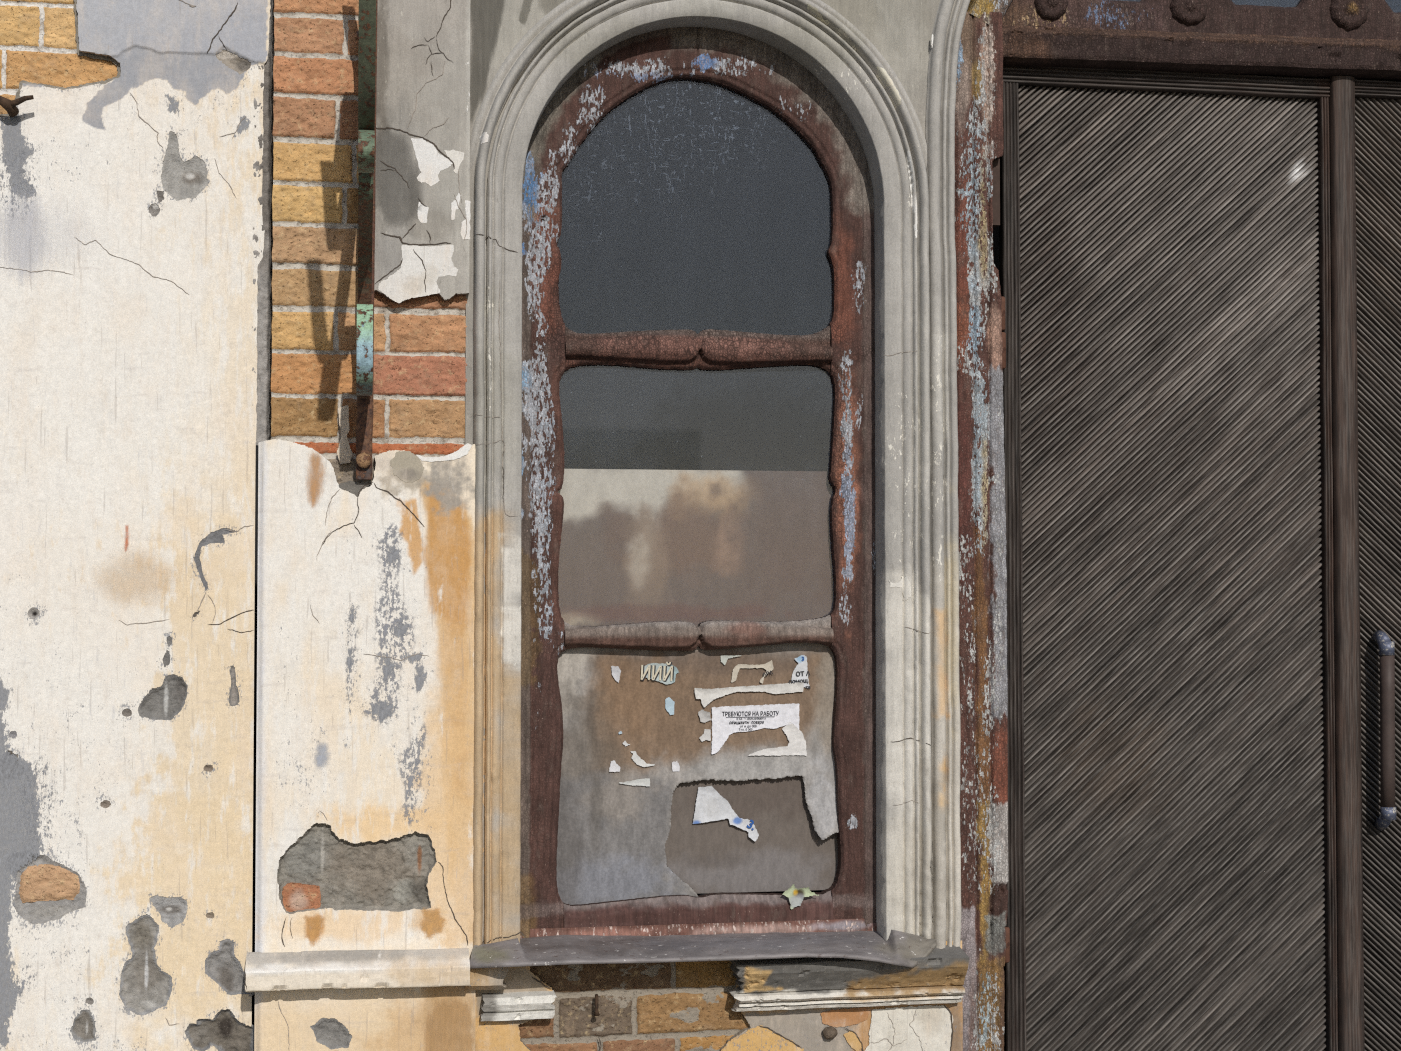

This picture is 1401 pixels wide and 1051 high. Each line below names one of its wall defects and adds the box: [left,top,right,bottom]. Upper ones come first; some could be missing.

spalling [0,0,121,217]
peeling [411,138,464,186]
crack [376,0,516,292]
peeling [378,193,471,303]
crack [317,482,425,555]
flaking render [122,636,188,720]
peeling [0,678,87,1048]
spalling [277,725,437,914]
flaking render [119,895,188,1015]
flaking render [185,939,254,1051]
flaking render [518,960,804,1051]
peeling [820,1005,953,1051]